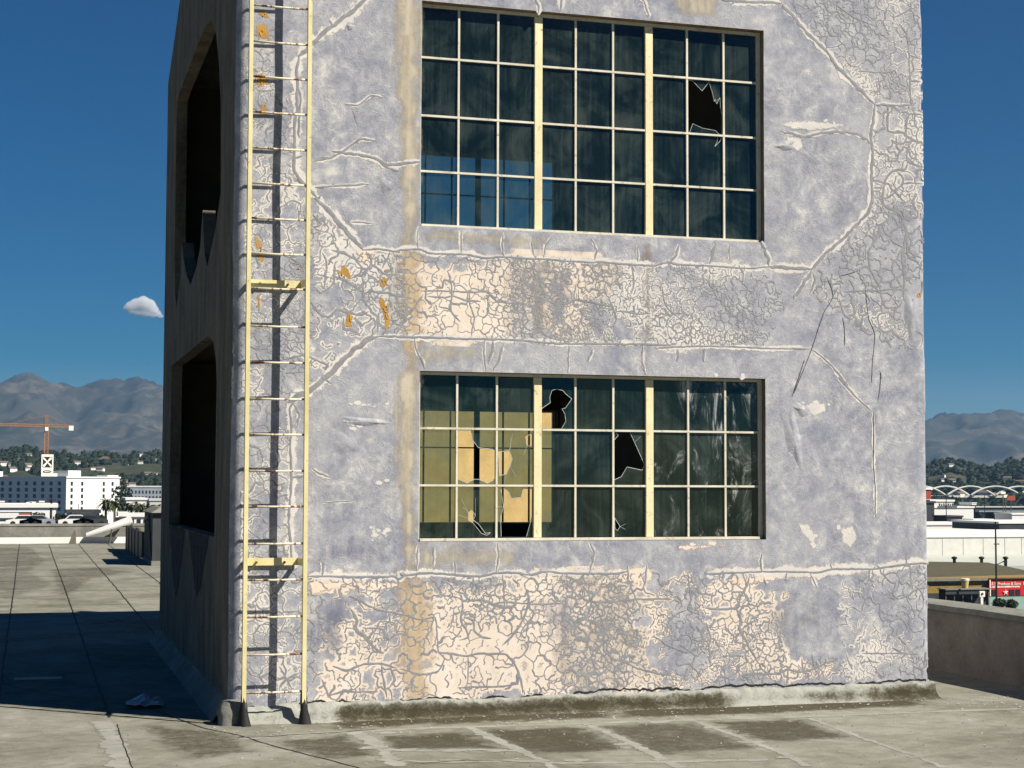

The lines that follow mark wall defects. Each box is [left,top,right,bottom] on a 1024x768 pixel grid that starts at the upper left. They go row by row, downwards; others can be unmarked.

peeling [783,119,843,151]
water stain [395,0,513,698]
crack [229,0,930,707]
peeling [798,523,817,548]
peeling [837,525,857,547]
peeling [310,581,400,596]
peeling [618,567,652,584]
water stain [156,700,1019,768]